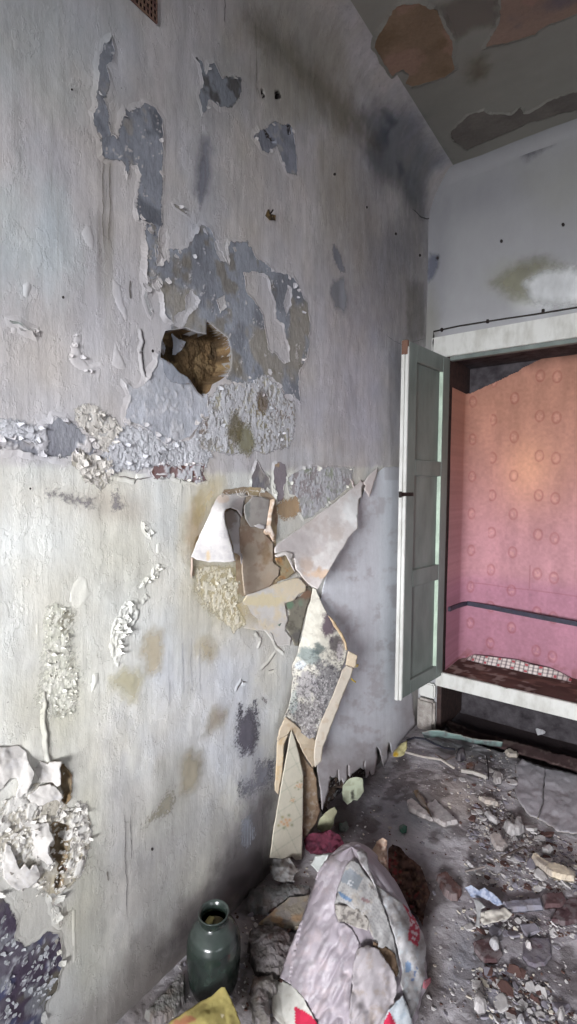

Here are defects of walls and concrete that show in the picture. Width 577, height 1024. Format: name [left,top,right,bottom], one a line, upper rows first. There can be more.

peeling [370,0,459,88]
peeling [481,0,577,51]
peeling [448,90,577,151]
peeling [0,33,355,522]
leakage [500,262,577,303]
peeling [140,520,154,540]
peeling [194,565,246,634]
peeling [33,603,79,719]
flaking render [319,768,370,814]
peeling [0,745,93,1024]